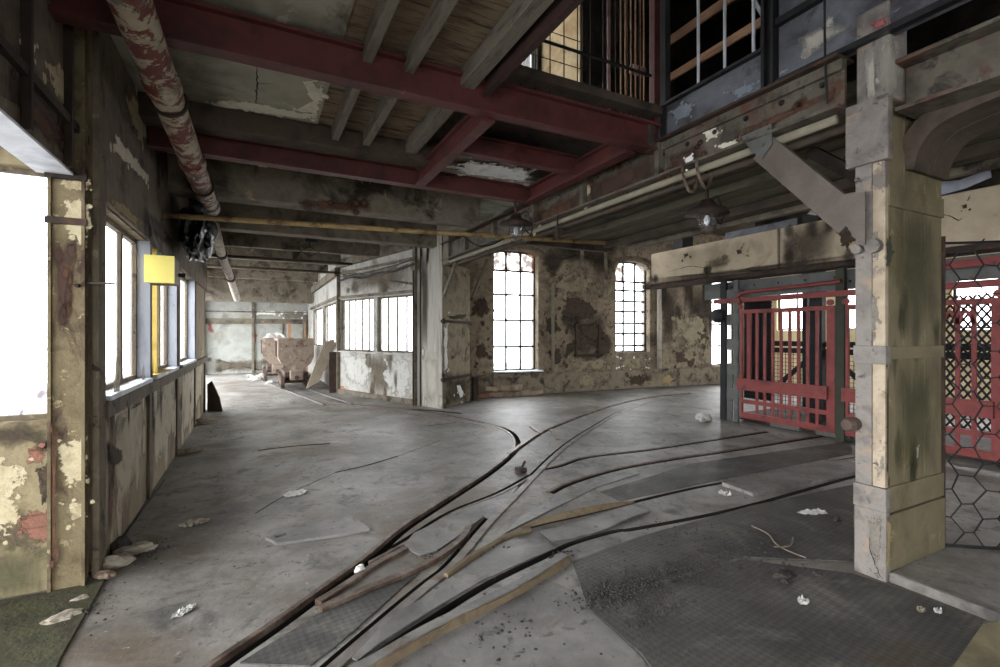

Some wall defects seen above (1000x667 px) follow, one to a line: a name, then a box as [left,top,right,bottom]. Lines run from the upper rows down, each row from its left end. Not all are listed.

crack [255,67,269,104]
peeling [204,80,330,122]
peeling [668,101,695,125]
peeling [109,85,149,189]
peeling [703,127,738,149]
peeling [446,160,533,186]
water stain [645,275,667,310]
water stain [366,351,397,395]
peeling [341,297,495,407]
water stain [896,379,928,482]
flaking render [0,436,95,545]